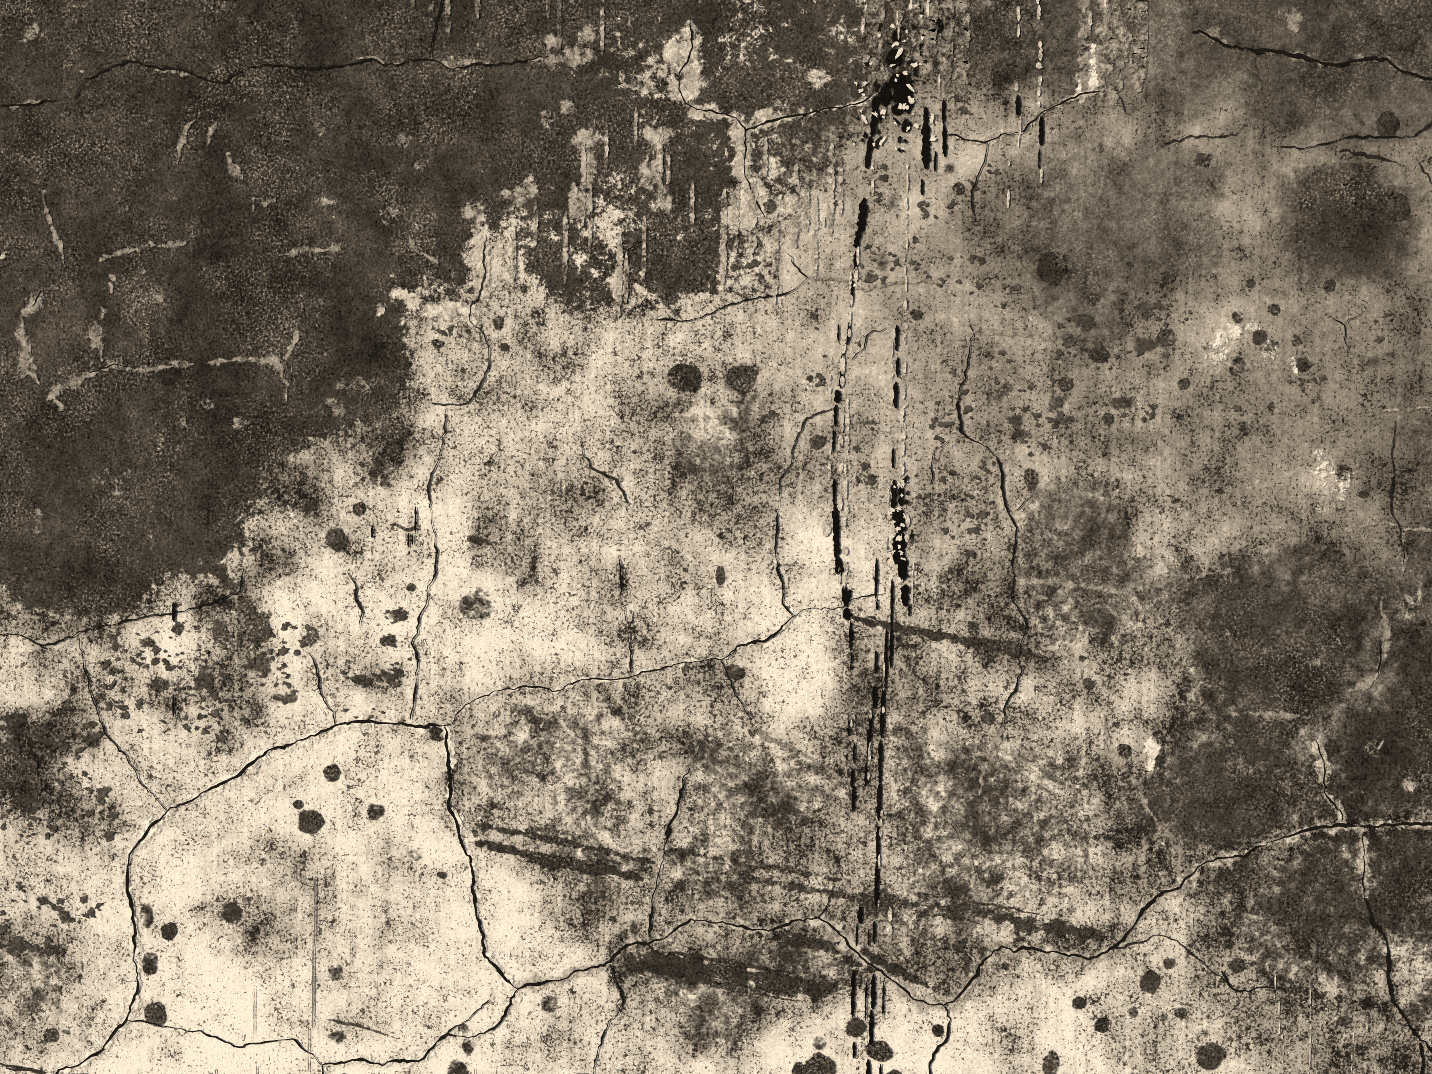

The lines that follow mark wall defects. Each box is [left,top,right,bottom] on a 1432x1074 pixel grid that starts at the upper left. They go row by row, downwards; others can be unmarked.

peeling [545,25,596,67]
crack [1192,30,1432,82]
peeling [568,128,600,224]
peeling [609,36,837,298]
crack [1164,122,1247,144]
crack [1279,120,1432,184]
peeling [377,202,516,345]
water stain [0,0,1432,670]
crack [0,234,1432,1074]
water stain [619,160,1109,1074]
water stain [292,800,324,834]
water stain [475,707,659,901]